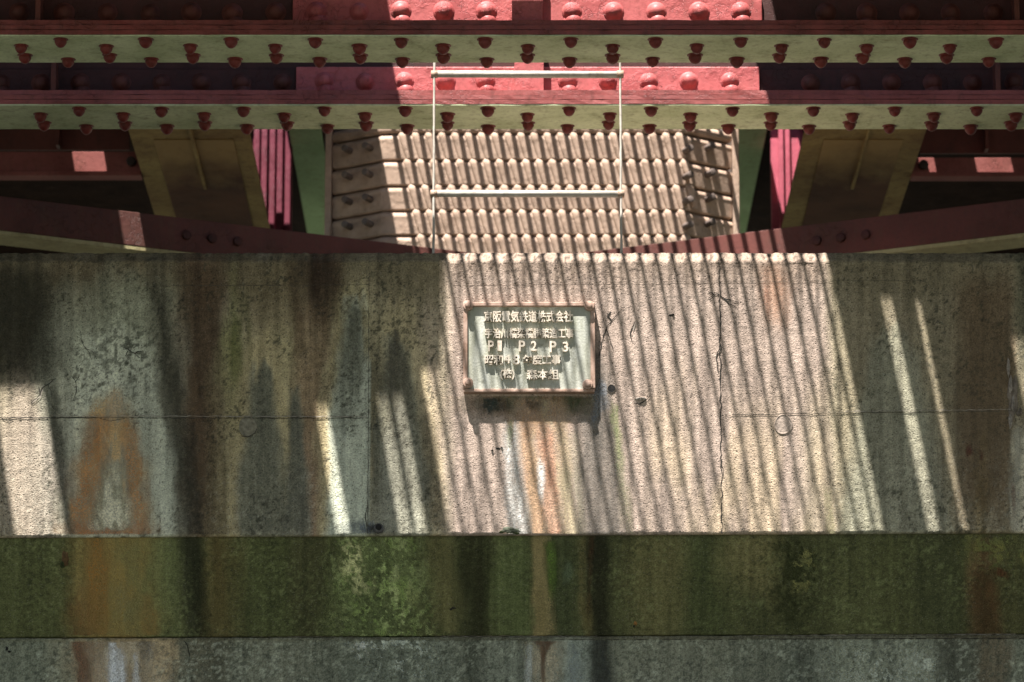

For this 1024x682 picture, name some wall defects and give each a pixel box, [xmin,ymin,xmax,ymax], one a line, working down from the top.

damp [51,402,65,502]
corrosion [71,395,143,534]
crack [450,255,1010,534]